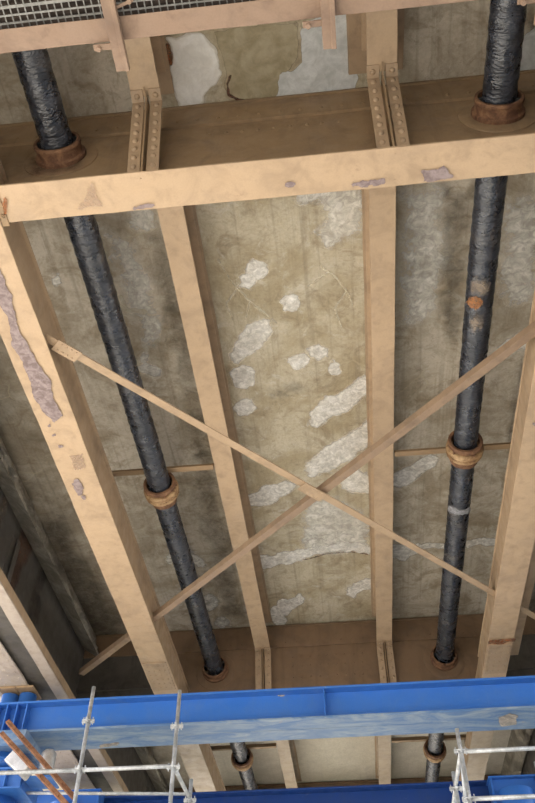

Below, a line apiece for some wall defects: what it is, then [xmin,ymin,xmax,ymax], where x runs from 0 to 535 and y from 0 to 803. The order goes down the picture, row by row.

peeling [166,15,358,106]
peeling [520,28,535,71]
peeling [421,166,453,182]
water stain [239,260,268,289]
peeling [0,270,63,448]
water stain [230,320,272,389]
water stain [310,376,366,427]
water stain [306,422,368,477]
peeling [71,455,86,500]
water stain [248,481,295,506]
water stain [342,470,369,493]
peeling [499,713,518,726]